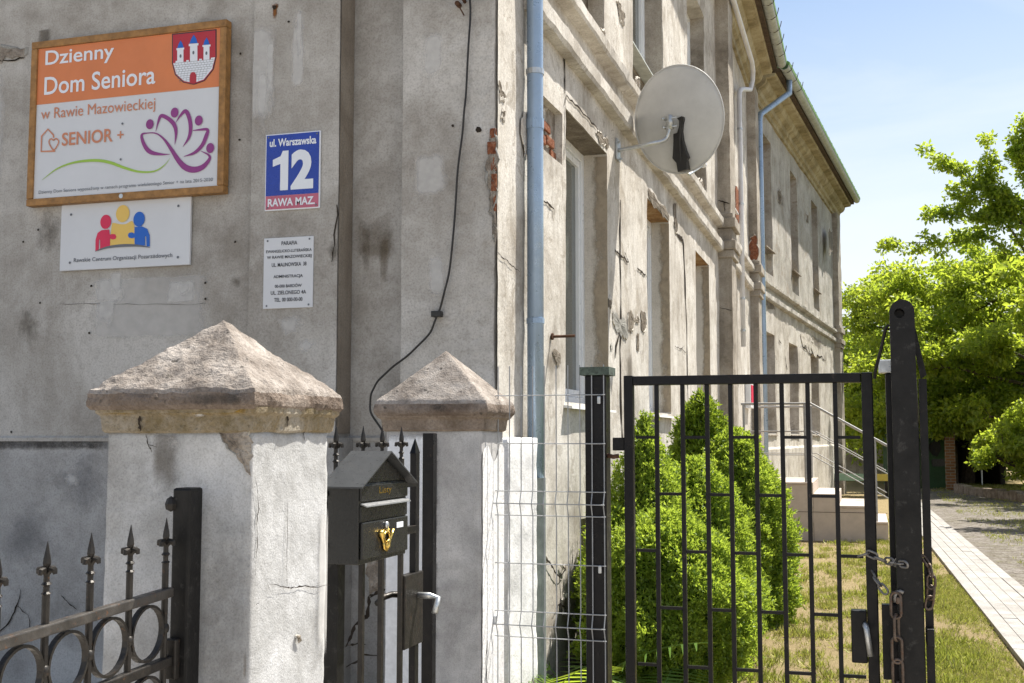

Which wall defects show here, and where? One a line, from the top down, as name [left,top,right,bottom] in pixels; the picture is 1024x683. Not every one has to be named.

flaking render [543,107,556,160]
flaking render [484,80,506,245]
peeling [594,130,647,367]
flaking render [749,234,760,261]
spalling [218,431,254,476]